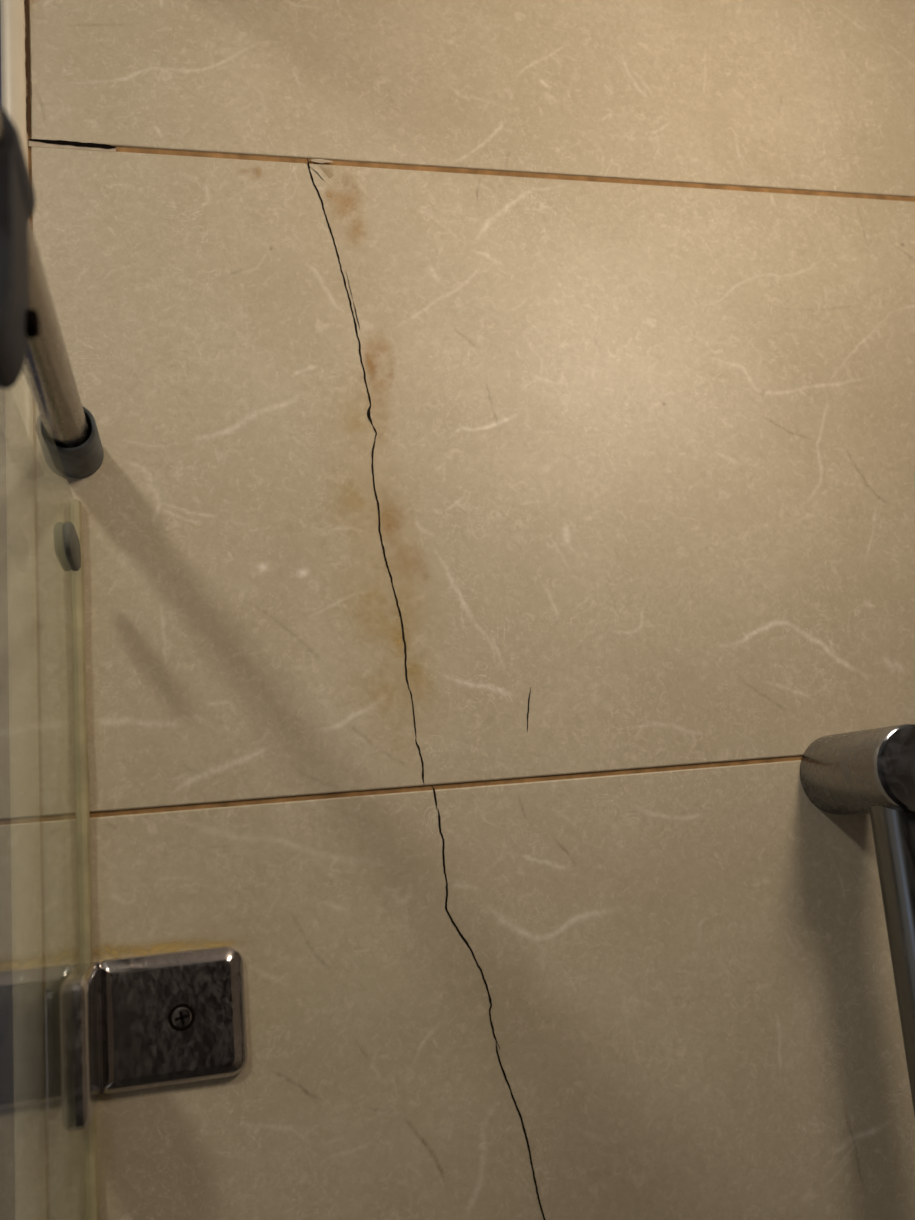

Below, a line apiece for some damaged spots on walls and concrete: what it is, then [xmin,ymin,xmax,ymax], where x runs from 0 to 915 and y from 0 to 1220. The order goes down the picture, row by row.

crack [307,158,546,1220]